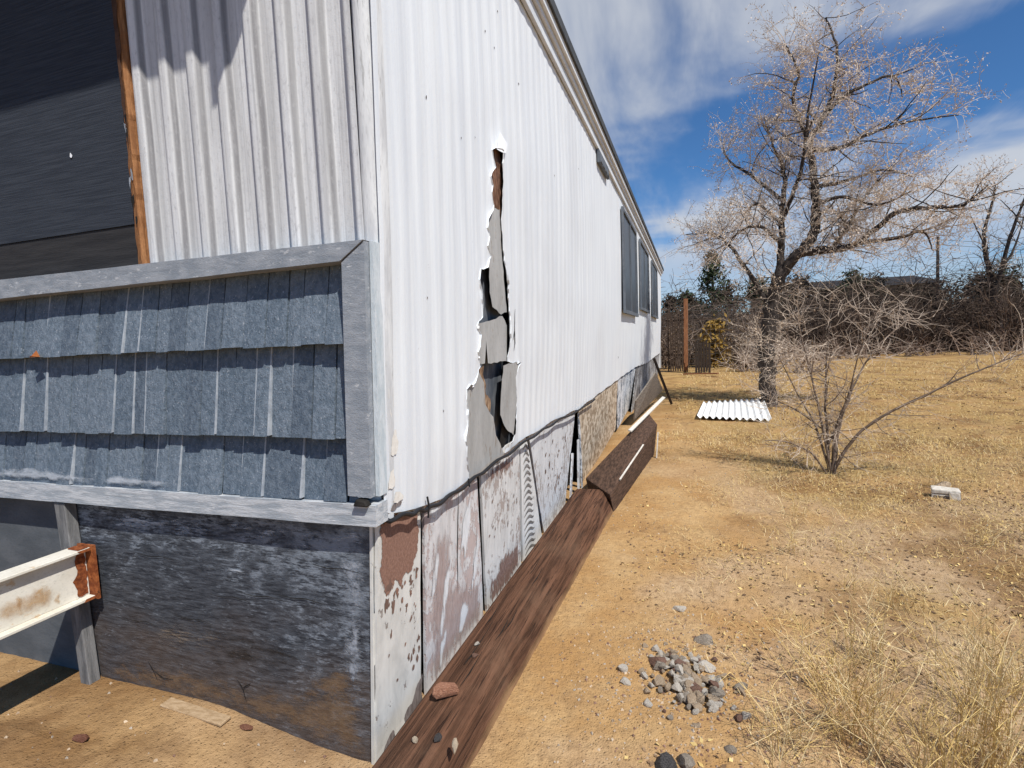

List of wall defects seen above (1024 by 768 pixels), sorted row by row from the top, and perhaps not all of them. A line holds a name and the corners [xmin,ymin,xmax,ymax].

peeling [488,457,513,482]
corrosion [68,546,96,603]
peeling [380,469,420,622]
peeling [432,498,519,677]
peeling [404,635,423,722]